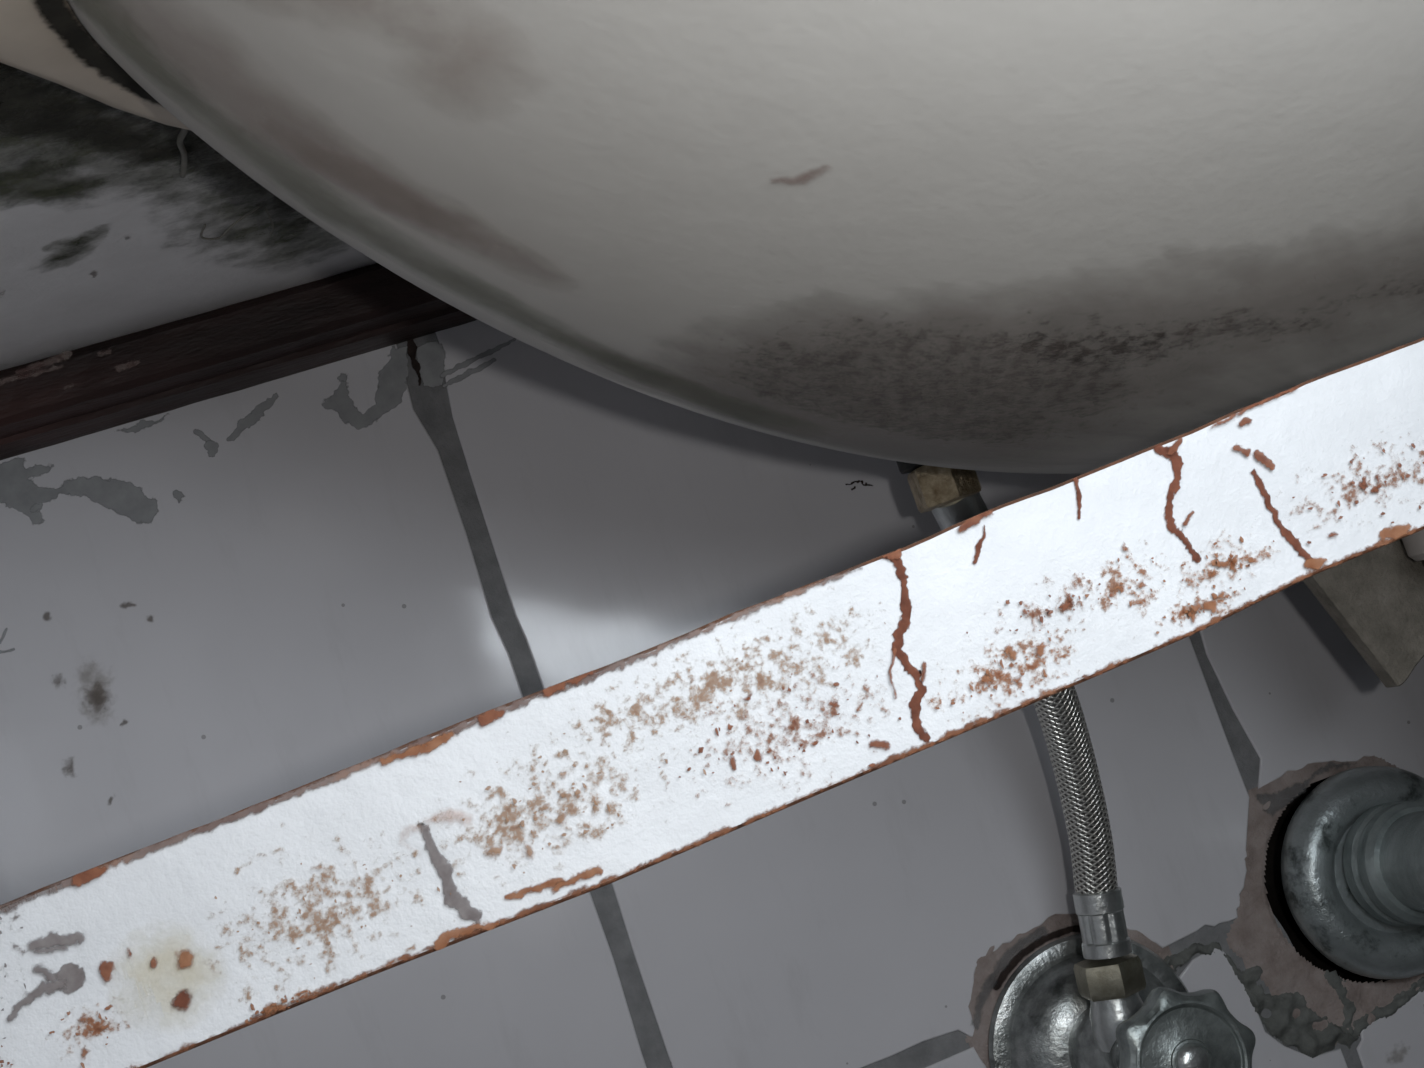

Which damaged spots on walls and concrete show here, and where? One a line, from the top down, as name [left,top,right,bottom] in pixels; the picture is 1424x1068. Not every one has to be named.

leakage [0,62,336,264]
rust [1212,386,1299,427]
crack [1154,438,1201,563]
crack [1233,445,1312,560]
crack [882,549,931,742]
rust [0,437,1424,1068]
peeling [0,915,85,1039]
spalling [965,914,1081,1068]
spalling [1127,756,1424,1058]